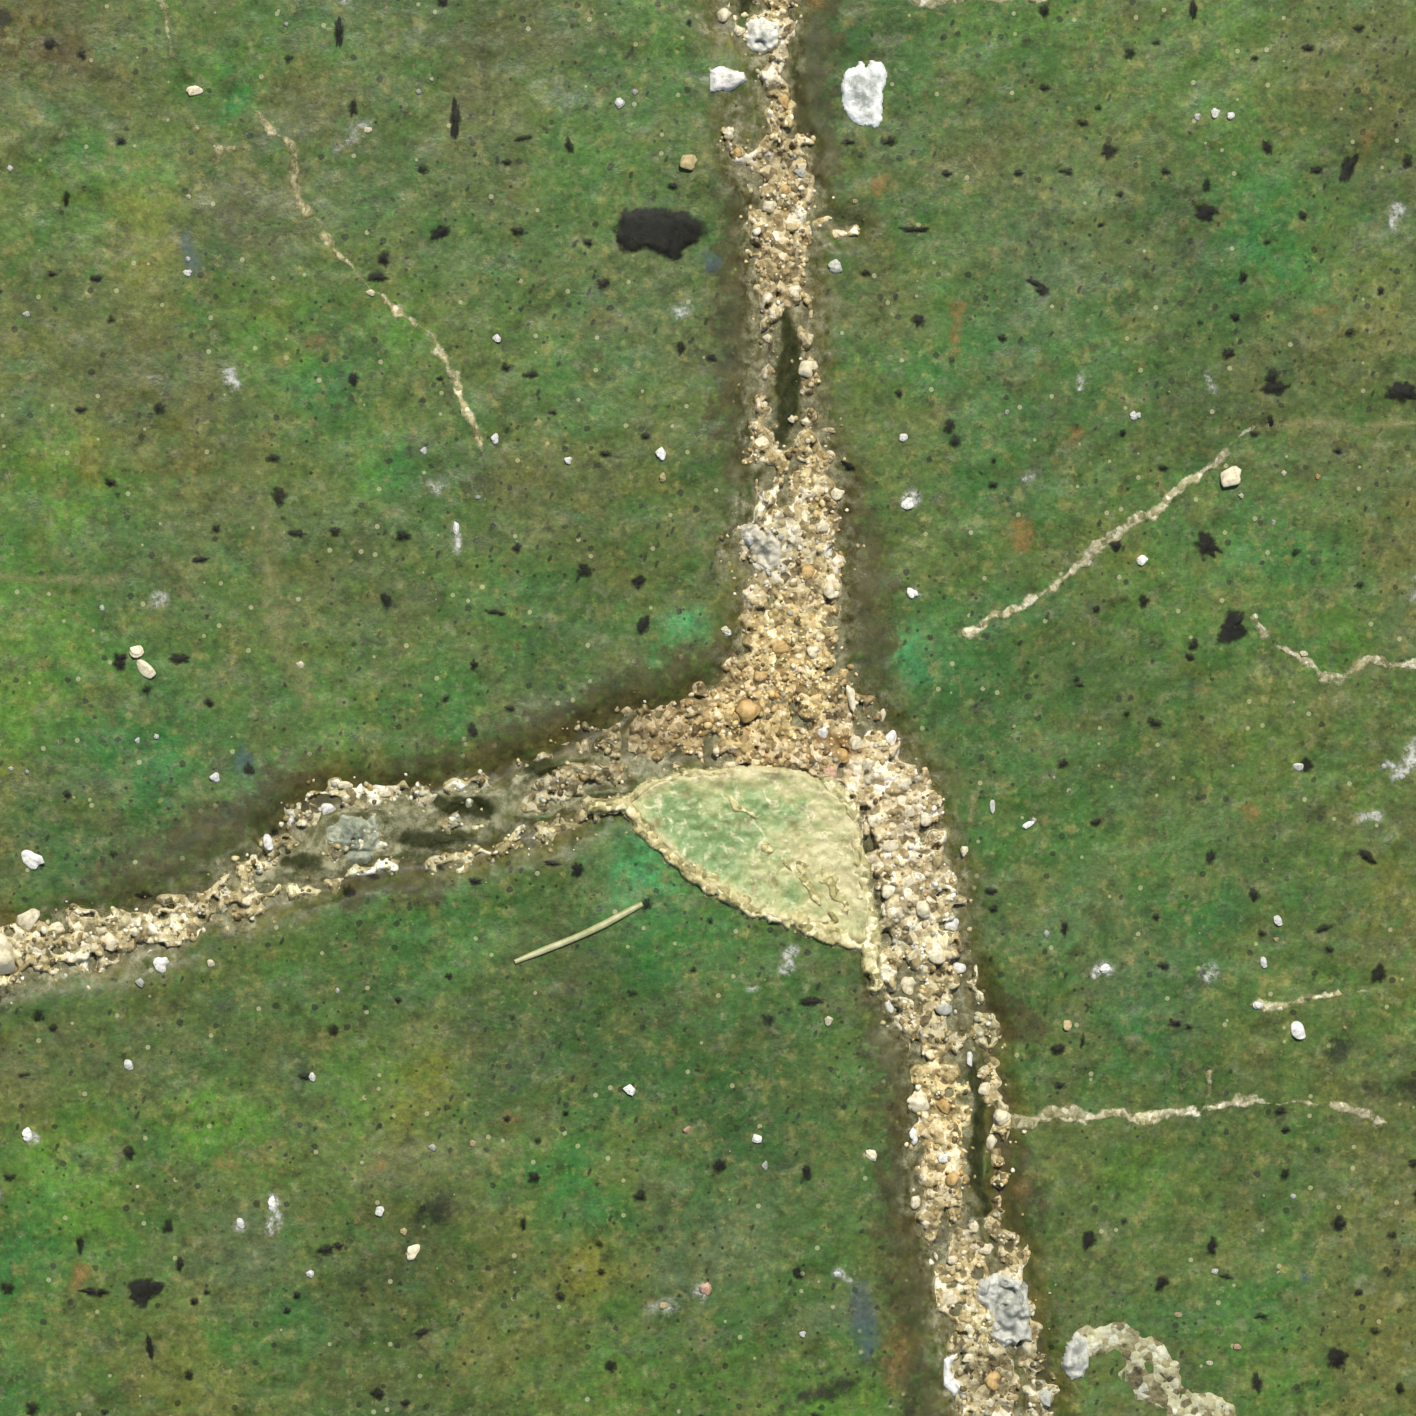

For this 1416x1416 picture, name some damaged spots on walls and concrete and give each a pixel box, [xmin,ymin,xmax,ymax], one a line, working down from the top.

crack [188,112,483,447]
crack [962,426,1255,638]
crack [516,0,1200,1416]
crack [1253,614,1416,682]
crack [0,774,527,987]
crack [1207,1093,1266,1110]
crack [1286,1101,1386,1126]
peeling [1061,1332,1089,1380]